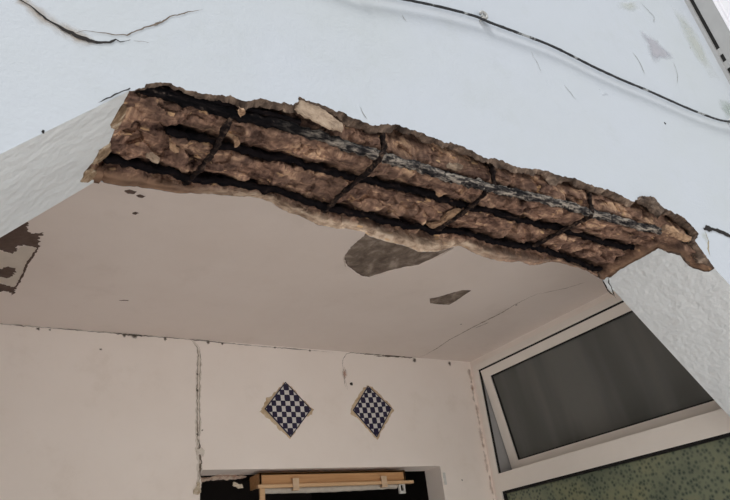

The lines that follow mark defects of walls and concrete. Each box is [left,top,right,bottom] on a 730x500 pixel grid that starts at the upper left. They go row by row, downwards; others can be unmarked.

crack [21,0,197,44]
spalling [80,82,714,280]
peeling [0,222,44,295]
crack [703,225,730,247]
peeling [430,290,471,305]
crack [17,325,243,495]